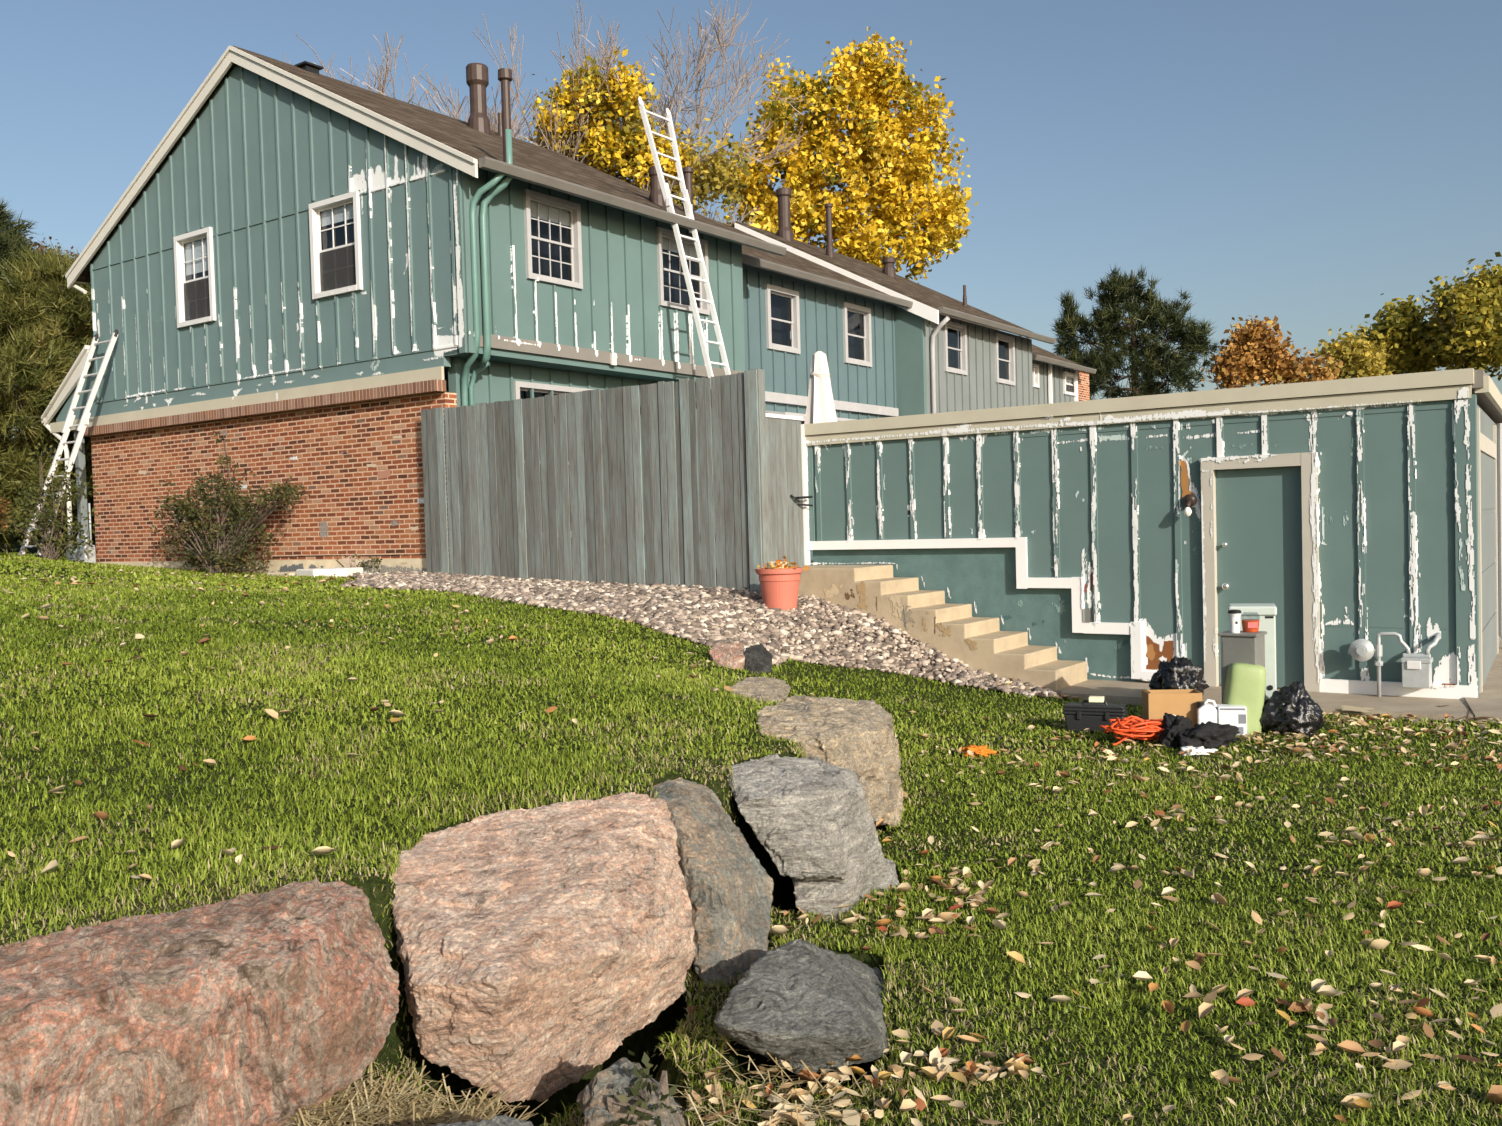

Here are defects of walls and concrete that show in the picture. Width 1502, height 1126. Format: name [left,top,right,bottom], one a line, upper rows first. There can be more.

peeling [1179,461,1194,499]
peeling [1147,644,1156,661]